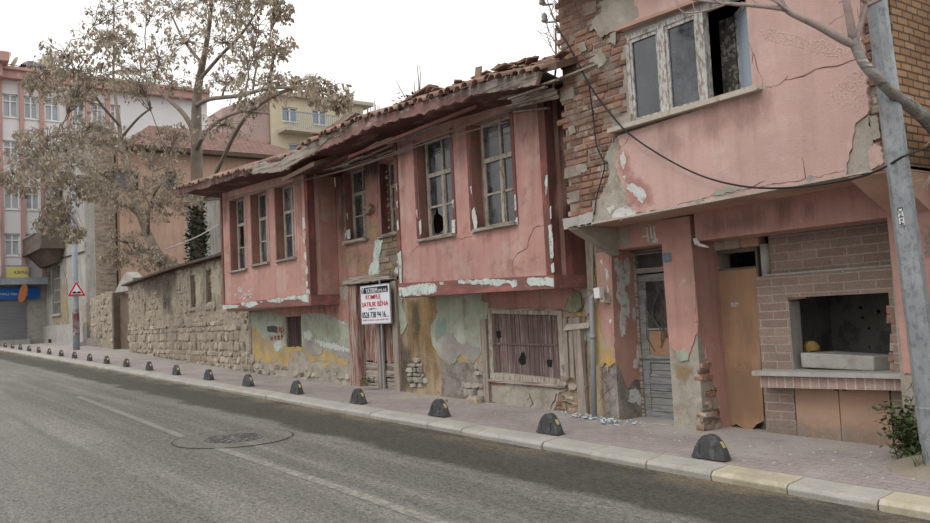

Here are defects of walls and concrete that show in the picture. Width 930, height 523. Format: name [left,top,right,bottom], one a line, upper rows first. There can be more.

crack [749,44,855,88]
flaking render [555,0,886,243]
peeling [369,169,444,306]
peeling [458,206,555,288]
flaking render [127,217,350,385]
peeling [600,257,636,337]
peeling [628,388,641,405]
spalling [694,362,726,431]